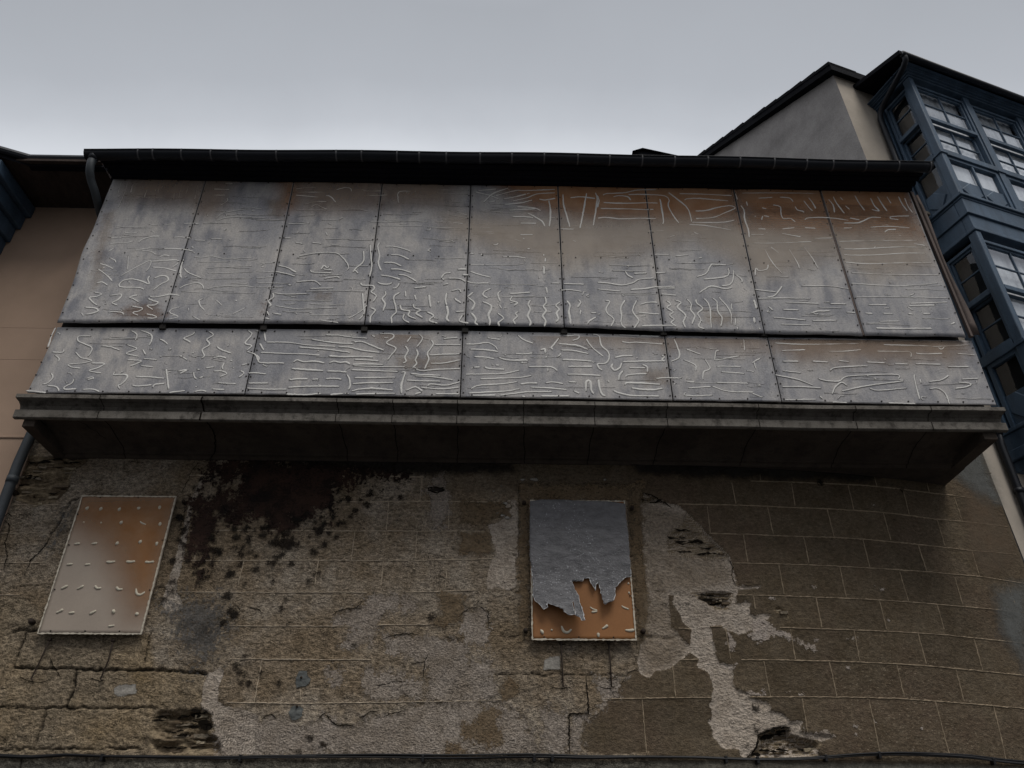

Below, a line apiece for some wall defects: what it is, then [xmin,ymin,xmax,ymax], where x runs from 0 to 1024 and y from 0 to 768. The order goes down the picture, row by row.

crack [3,513,49,575]
damp [76,459,513,628]
crack [375,601,489,686]
flaking render [148,471,836,763]
crack [319,711,402,726]
crack [568,680,590,754]